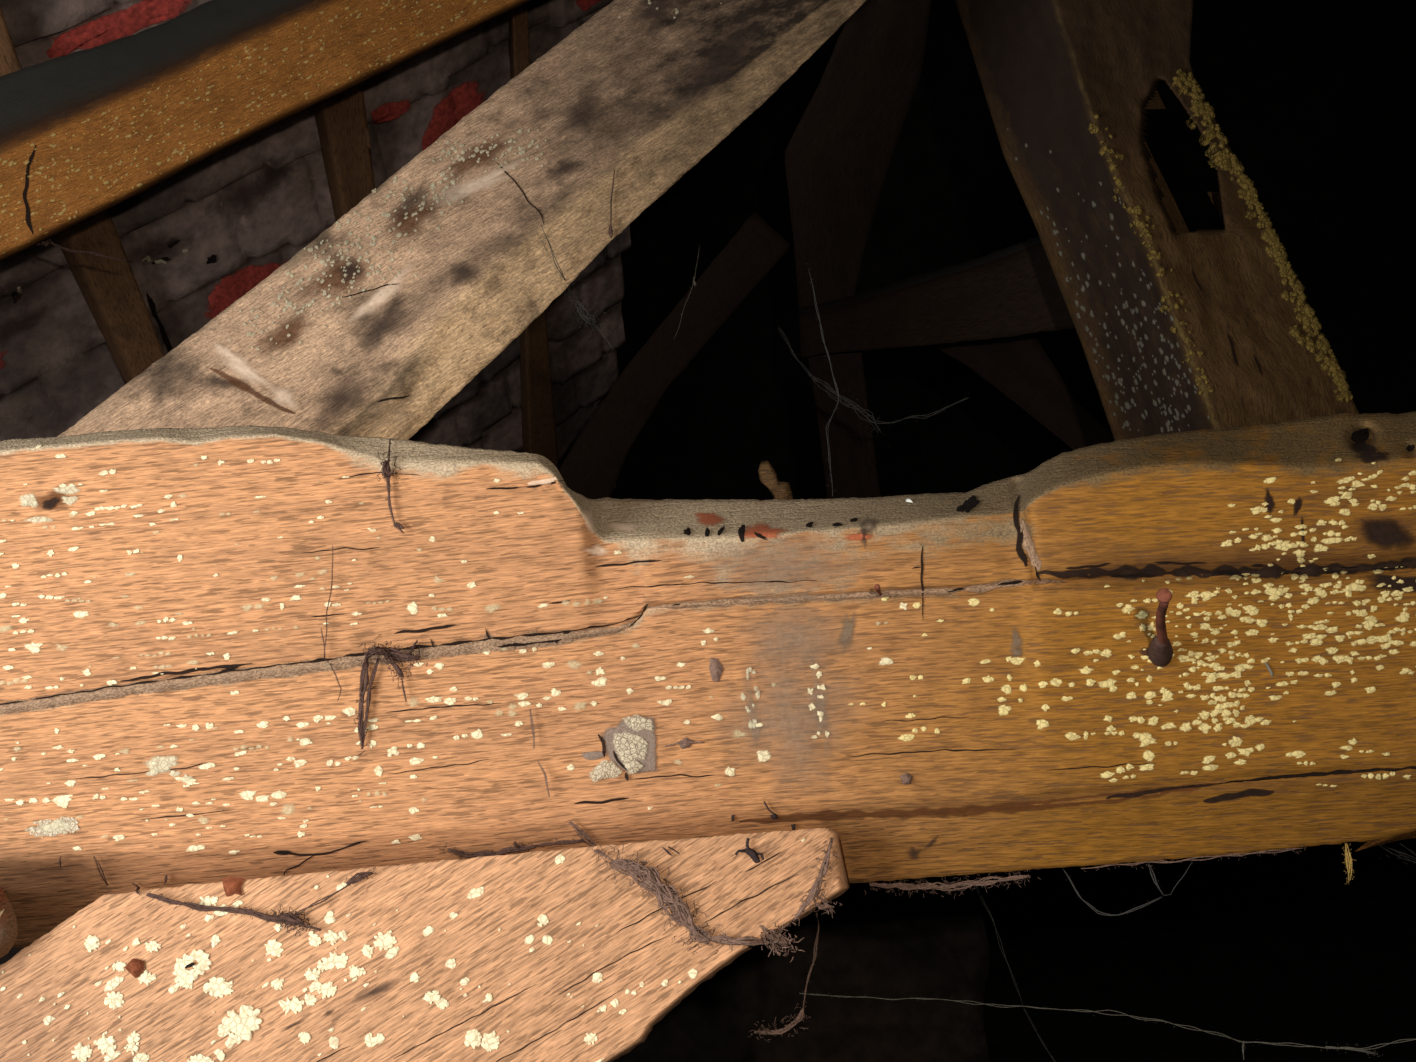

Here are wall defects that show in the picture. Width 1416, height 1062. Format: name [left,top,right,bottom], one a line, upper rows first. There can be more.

crack [22,145,36,234]
leakage [230,129,573,360]
crack [338,471,417,479]
crack [0,495,1416,715]
crack [851,716,1014,757]
crack [77,763,221,779]
crack [390,759,489,774]
crack [140,811,221,820]
crack [395,763,1416,1062]